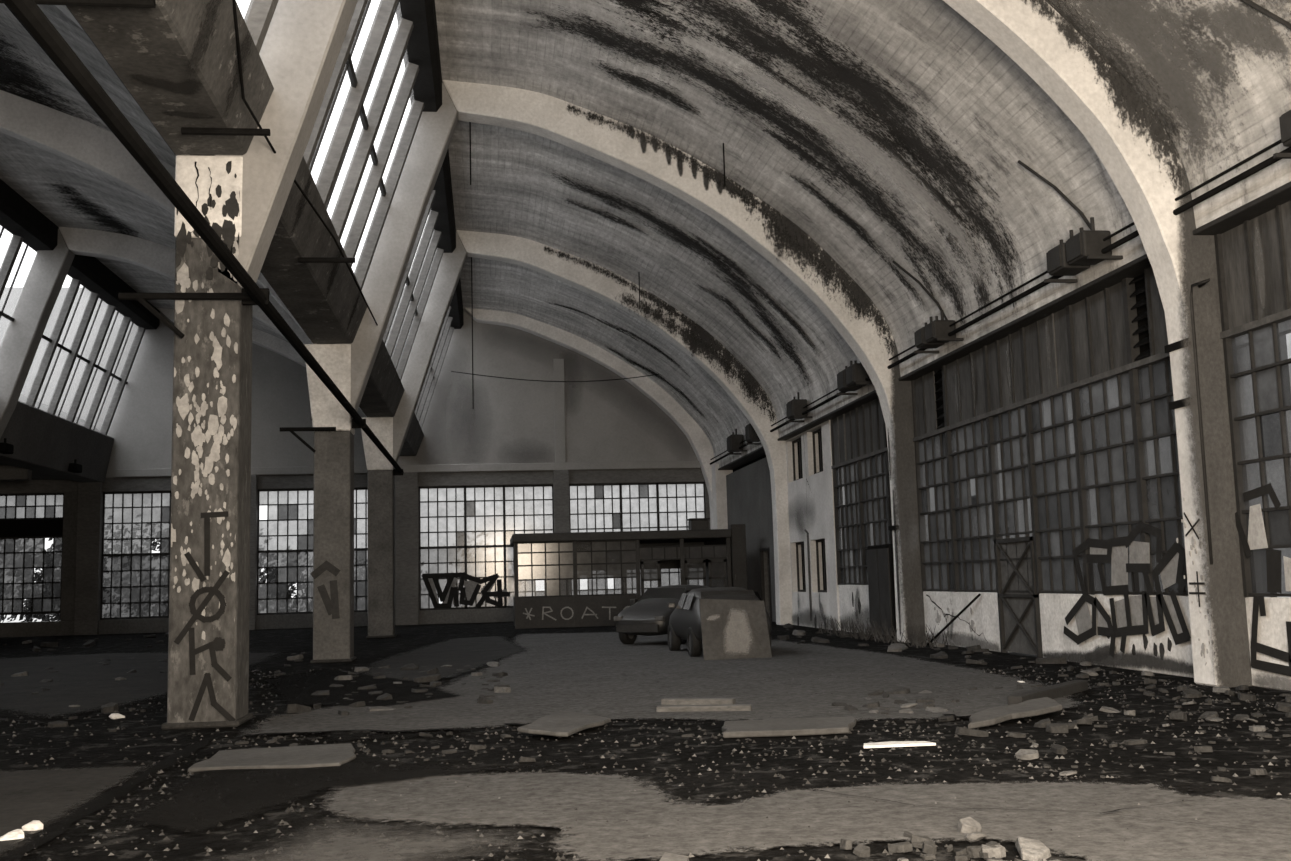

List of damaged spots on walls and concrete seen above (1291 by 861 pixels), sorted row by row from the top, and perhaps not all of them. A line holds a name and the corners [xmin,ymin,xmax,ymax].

water stain [0,64,60,111]
water stain [592,63,706,116]
water stain [565,105,895,356]
water stain [641,0,991,311]
water stain [1024,0,1291,191]
peeling [170,161,240,593]
water stain [544,247,776,422]